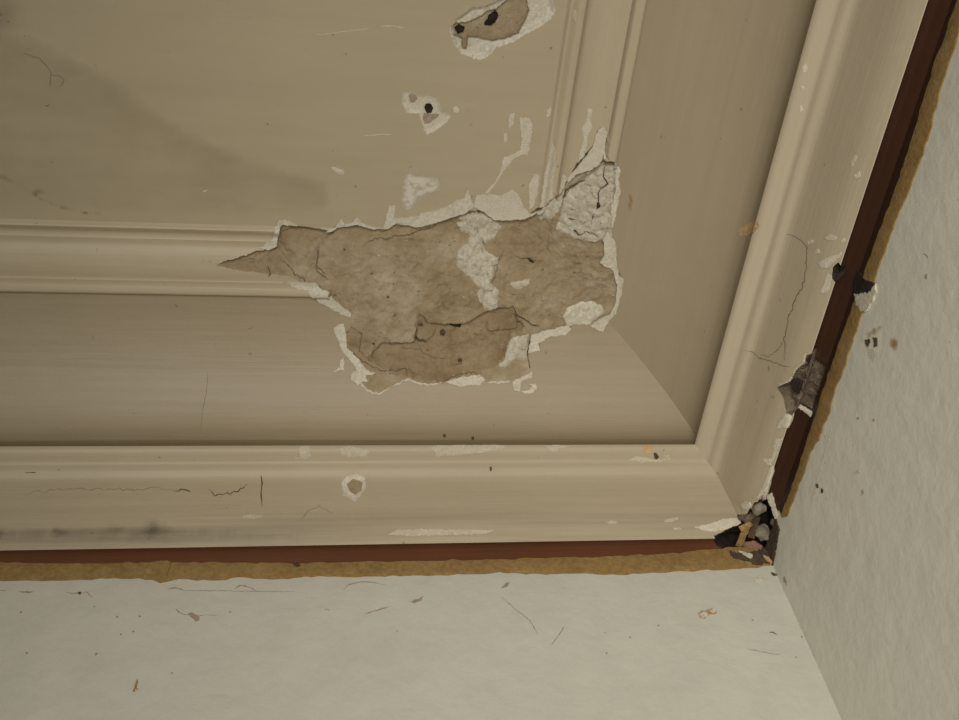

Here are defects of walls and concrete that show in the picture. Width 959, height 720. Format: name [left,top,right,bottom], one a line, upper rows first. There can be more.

flaking render [449,0,555,60]
flaking render [401,91,459,135]
flaking render [216,108,624,395]
crack [744,234,808,367]
peeling [777,0,959,518]
crack [25,472,263,502]
peeling [0,438,782,583]